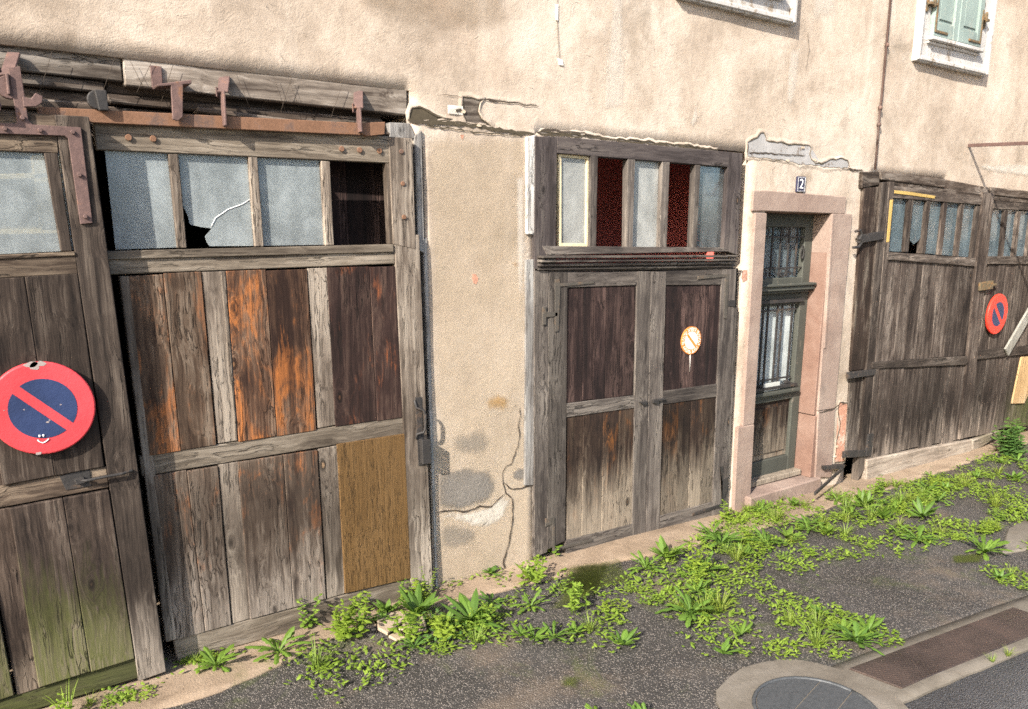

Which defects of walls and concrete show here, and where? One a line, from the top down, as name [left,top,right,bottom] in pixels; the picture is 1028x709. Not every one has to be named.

flaking render [405,92,495,140]
flaking render [744,128,850,173]
crack [438,404,533,569]